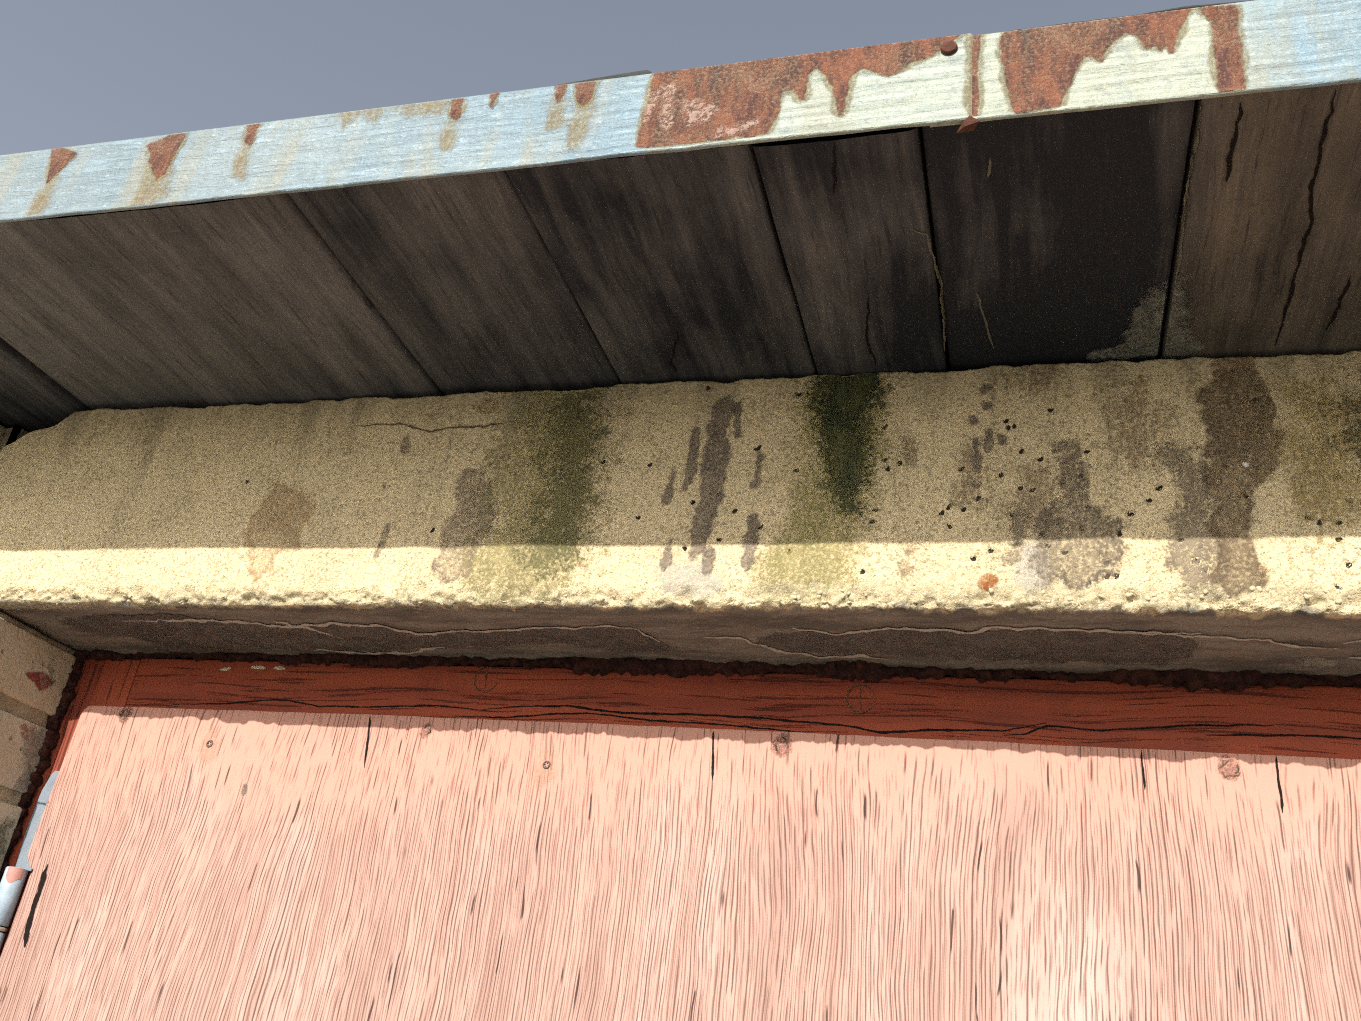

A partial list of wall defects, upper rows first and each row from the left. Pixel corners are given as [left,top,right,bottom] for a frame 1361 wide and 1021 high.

corrosion [636,4,1249,147]
corrosion [28,148,77,215]
corrosion [133,133,188,205]
corrosion [234,123,263,178]
crack [830,143,838,194]
crack [1226,102,1243,182]
crack [1274,89,1337,346]
crack [865,298,876,365]
damp [1087,278,1204,360]
crack [1326,276,1351,331]
damp [950,446,986,507]
damp [1002,356,1361,598]